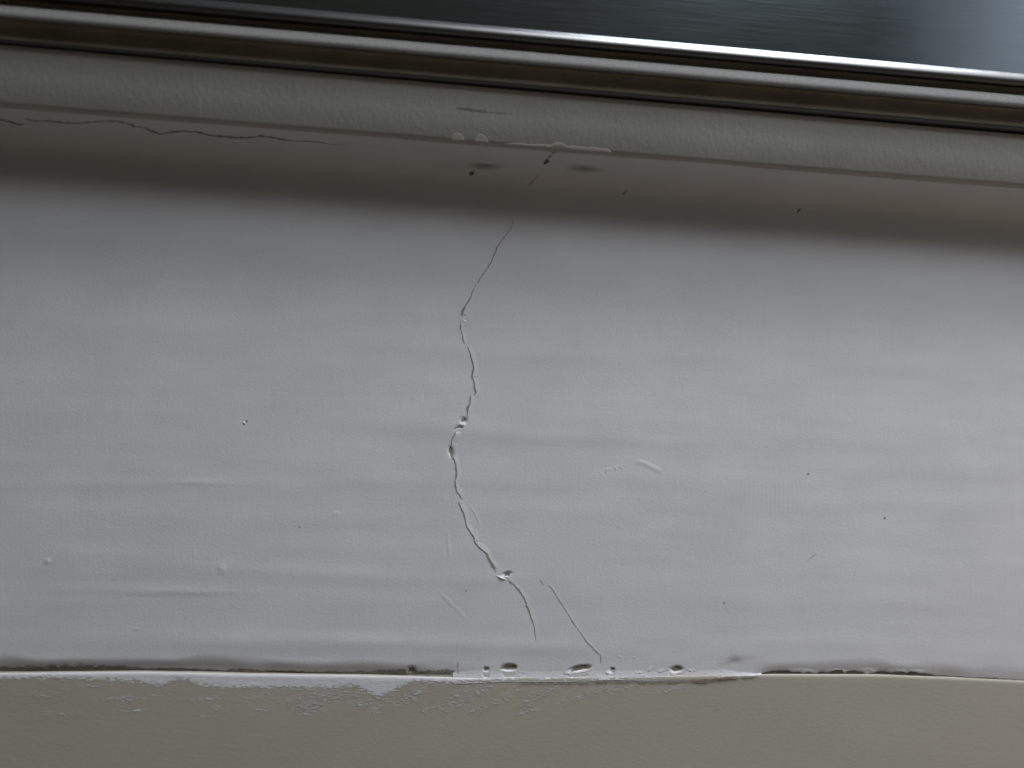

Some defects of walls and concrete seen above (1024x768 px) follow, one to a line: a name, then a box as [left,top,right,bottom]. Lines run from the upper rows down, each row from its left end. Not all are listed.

crack [449,220,757,684]
hole [500,664,518,673]
hole [571,665,592,674]